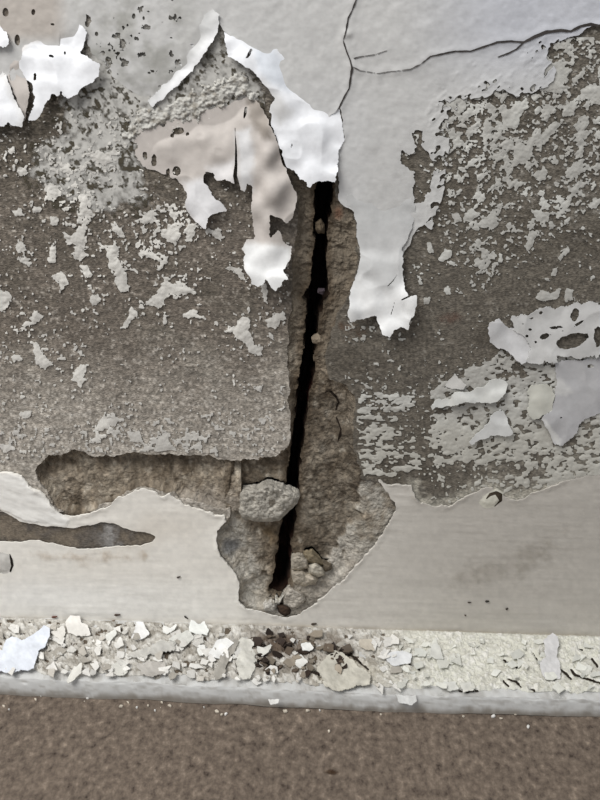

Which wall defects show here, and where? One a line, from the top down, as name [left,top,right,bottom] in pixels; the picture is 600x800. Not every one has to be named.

crack [339,0,600,109]
peeling [0,6,600,617]
crack [269,181,342,591]